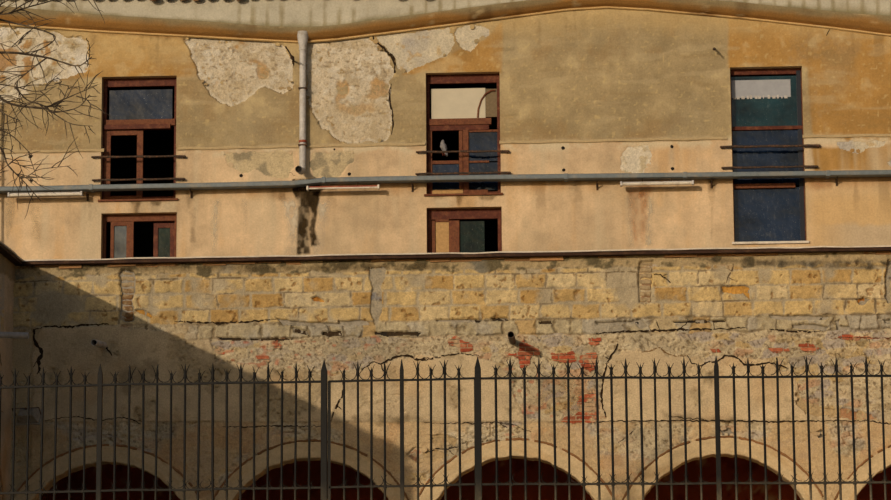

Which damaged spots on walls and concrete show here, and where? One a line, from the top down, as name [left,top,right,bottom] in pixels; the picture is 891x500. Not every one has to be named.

peeling [0,26,89,103]
peeling [184,37,294,107]
peeling [306,24,489,178]
peeling [620,145,652,173]
leakage [285,179,326,254]
crack [33,323,109,374]
flaking render [447,335,473,352]
flaking render [505,339,540,368]
flaking render [551,338,601,372]
flaking render [561,390,606,424]